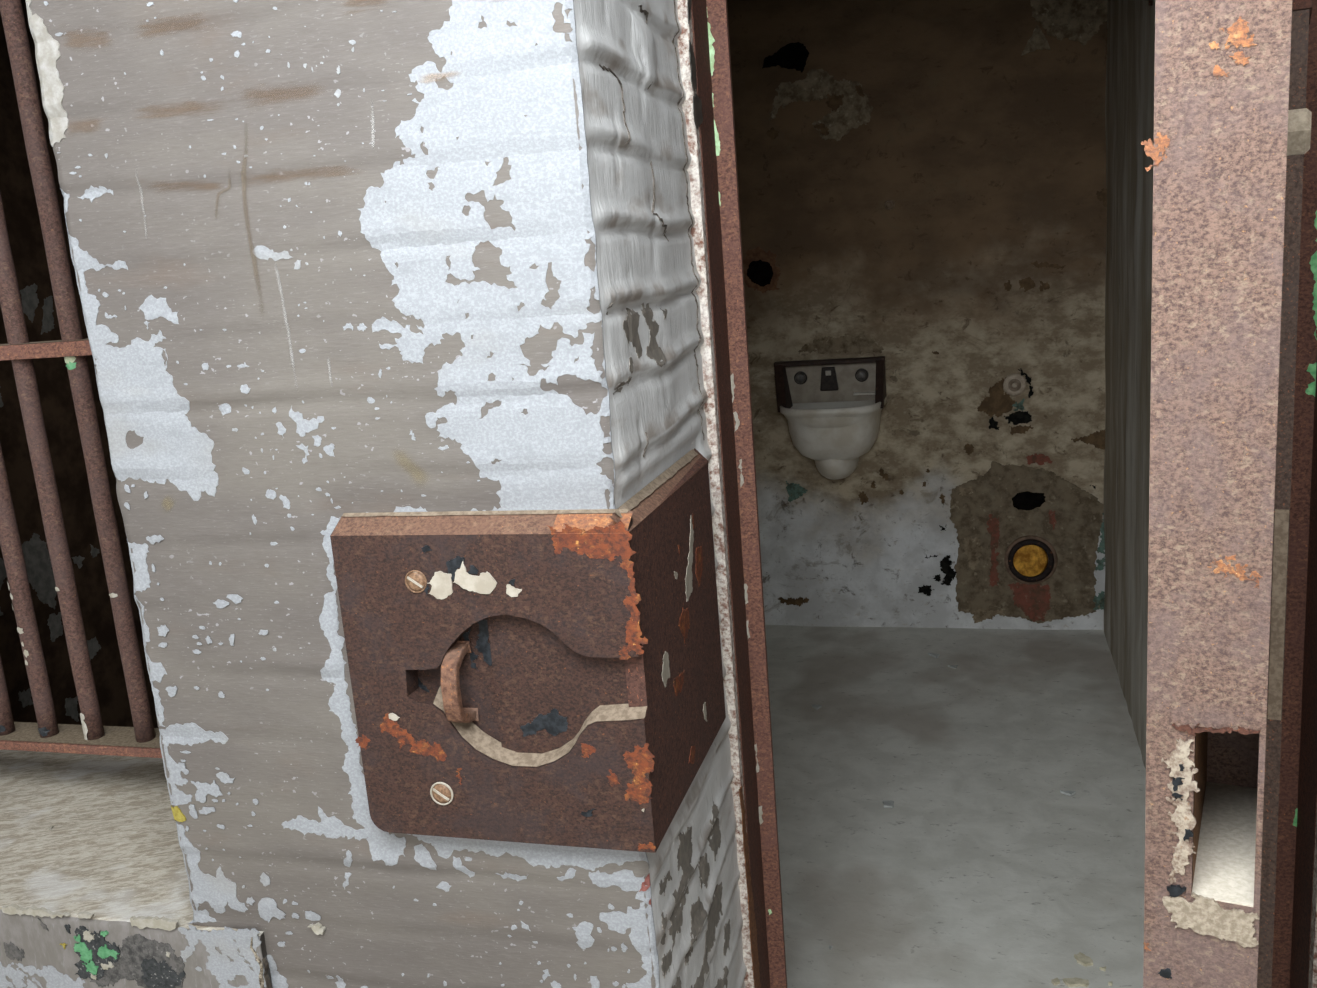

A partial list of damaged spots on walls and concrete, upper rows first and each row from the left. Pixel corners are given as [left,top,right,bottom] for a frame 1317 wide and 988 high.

peeling [231,31,271,58]
corrosion [1209,16,1258,79]
corrosion [1141,132,1170,172]
peeling [343,0,667,511]
corrosion [743,246,781,293]
peeling [60,153,219,510]
peeling [219,362,336,535]
spalling [1012,491,1046,510]
peeling [281,477,730,988]
peeling [1172,764,1185,801]
corrosion [739,786,761,988]
peeling [1166,885,1187,897]